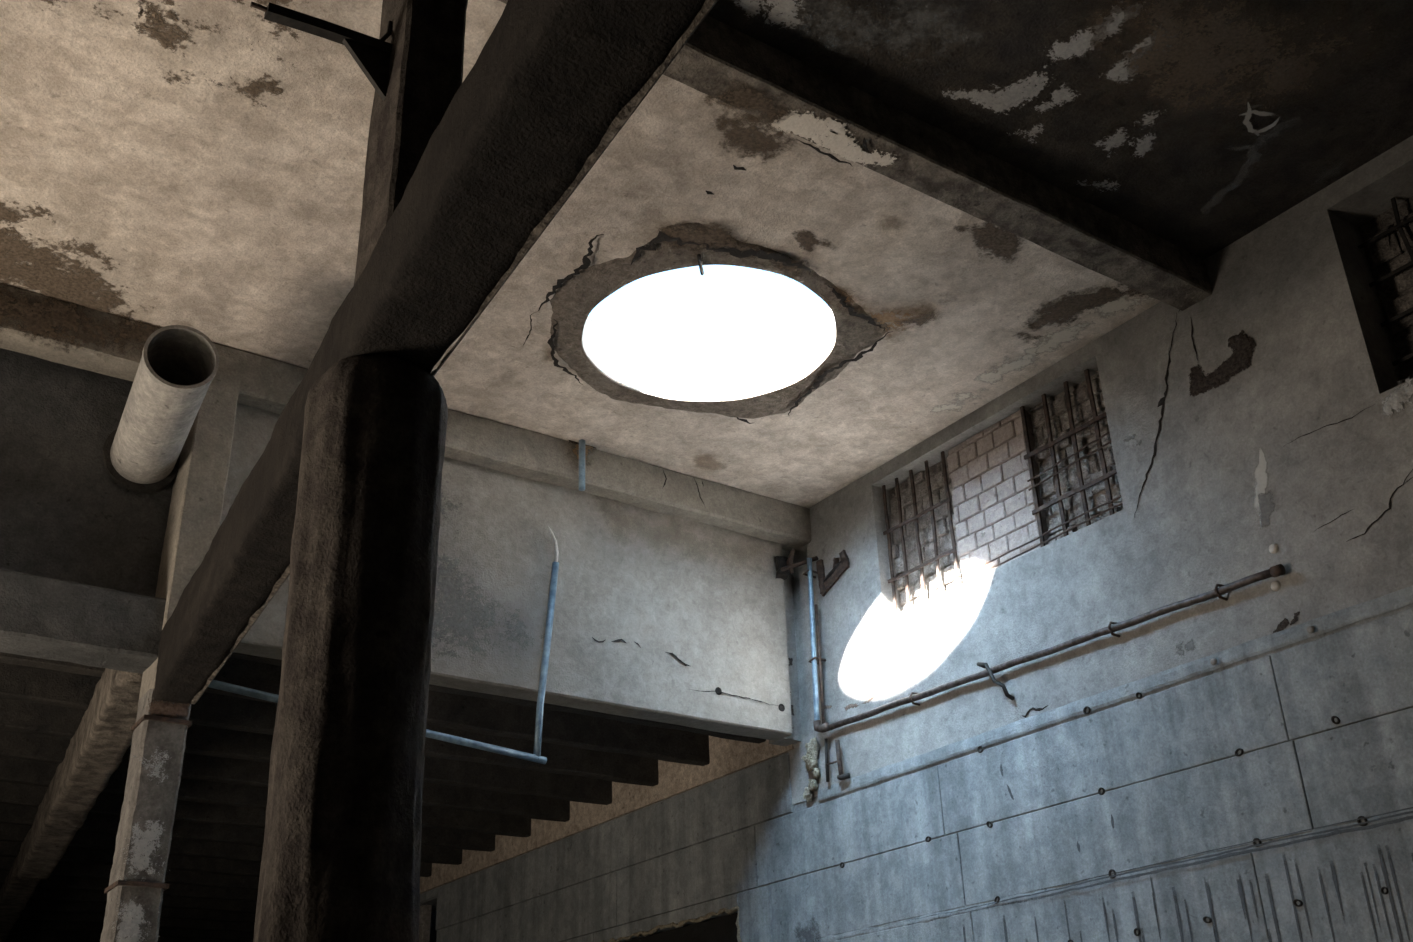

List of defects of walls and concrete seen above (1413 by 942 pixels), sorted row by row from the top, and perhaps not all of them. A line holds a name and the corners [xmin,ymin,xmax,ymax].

peeling [93,0,283,107]
peeling [942,1,1153,144]
peeling [770,109,897,167]
peeling [1095,109,1167,158]
peeling [0,201,141,317]
crack [523,234,604,385]
crack [631,231,893,415]
crack [1134,310,1198,518]
spalling [1189,330,1257,397]
crack [1316,469,1413,542]
peeling [118,817,170,881]
peeling [111,897,160,942]